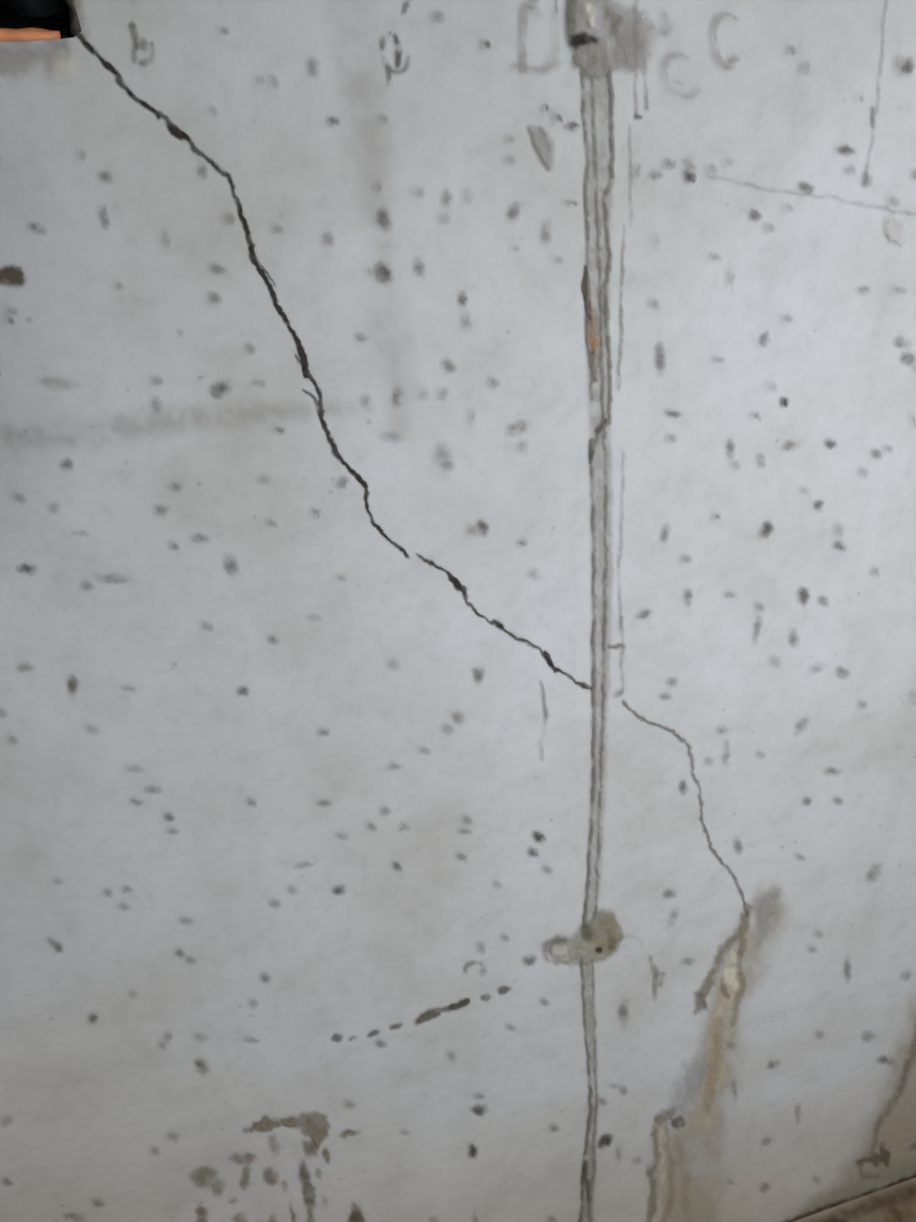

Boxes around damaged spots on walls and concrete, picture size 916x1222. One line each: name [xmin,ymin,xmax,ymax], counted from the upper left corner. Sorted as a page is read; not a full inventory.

crack [77,32,592,689]
crack [623,702,748,914]
water stain [647,901,773,1219]